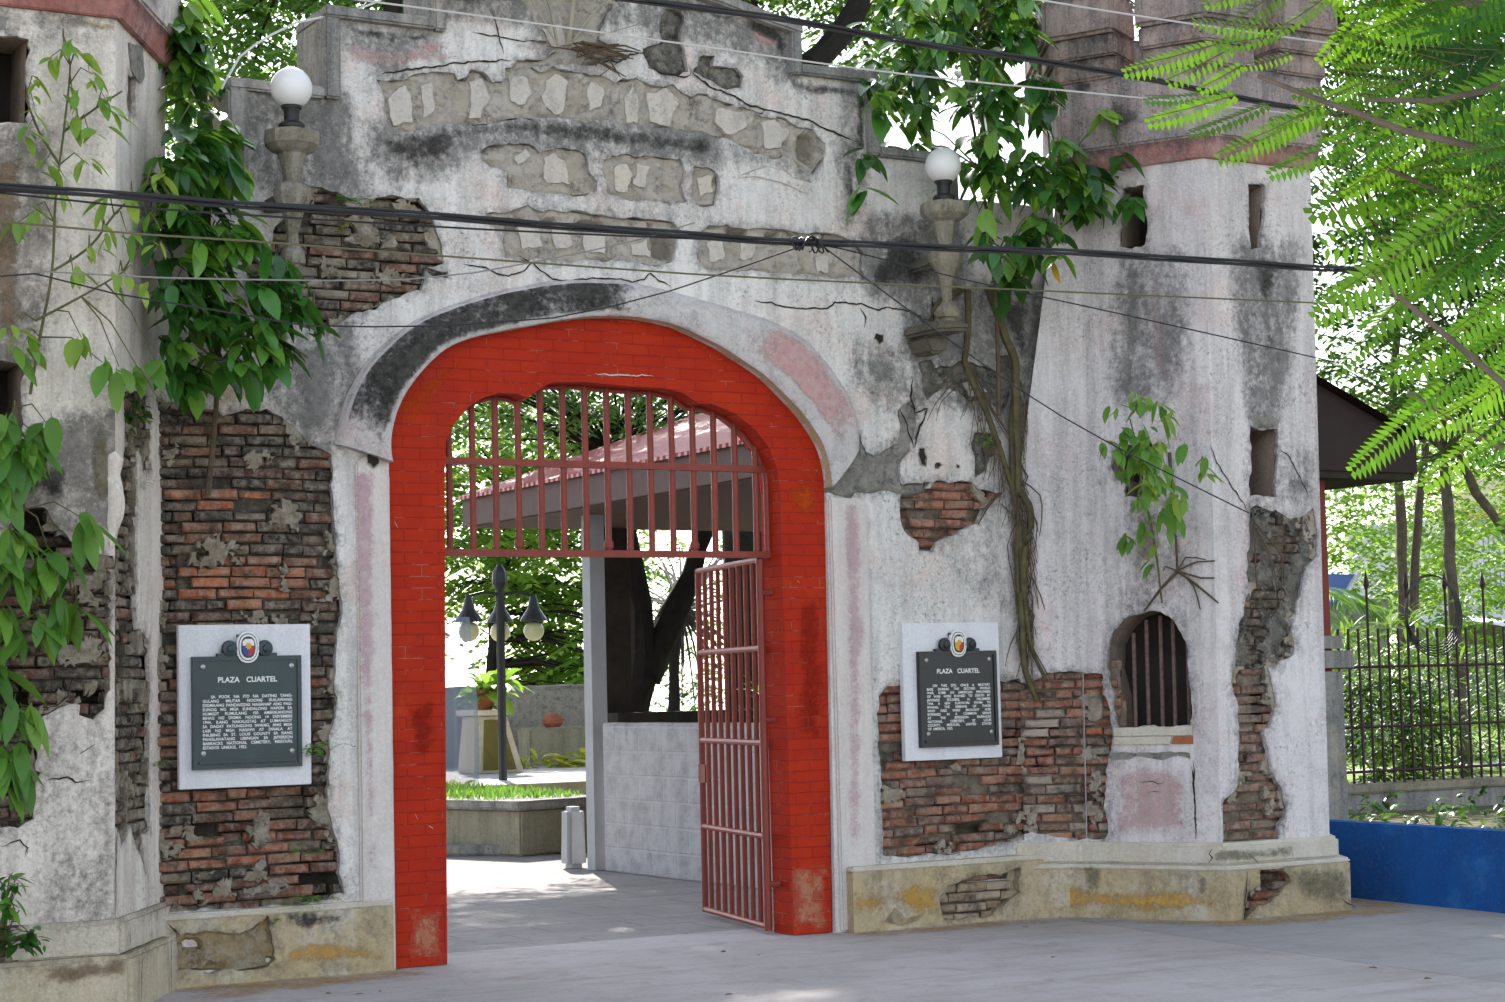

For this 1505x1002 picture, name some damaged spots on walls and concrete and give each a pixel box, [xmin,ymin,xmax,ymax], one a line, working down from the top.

spalling [377,0,825,194]
spalling [246,187,447,329]
spalling [480,144,717,267]
spalling [697,226,861,279]
spalling [824,356,1011,551]
spalling [0,391,342,971]
spalling [877,661,1190,857]
spalling [1222,495,1316,842]
spalling [884,868,1018,926]